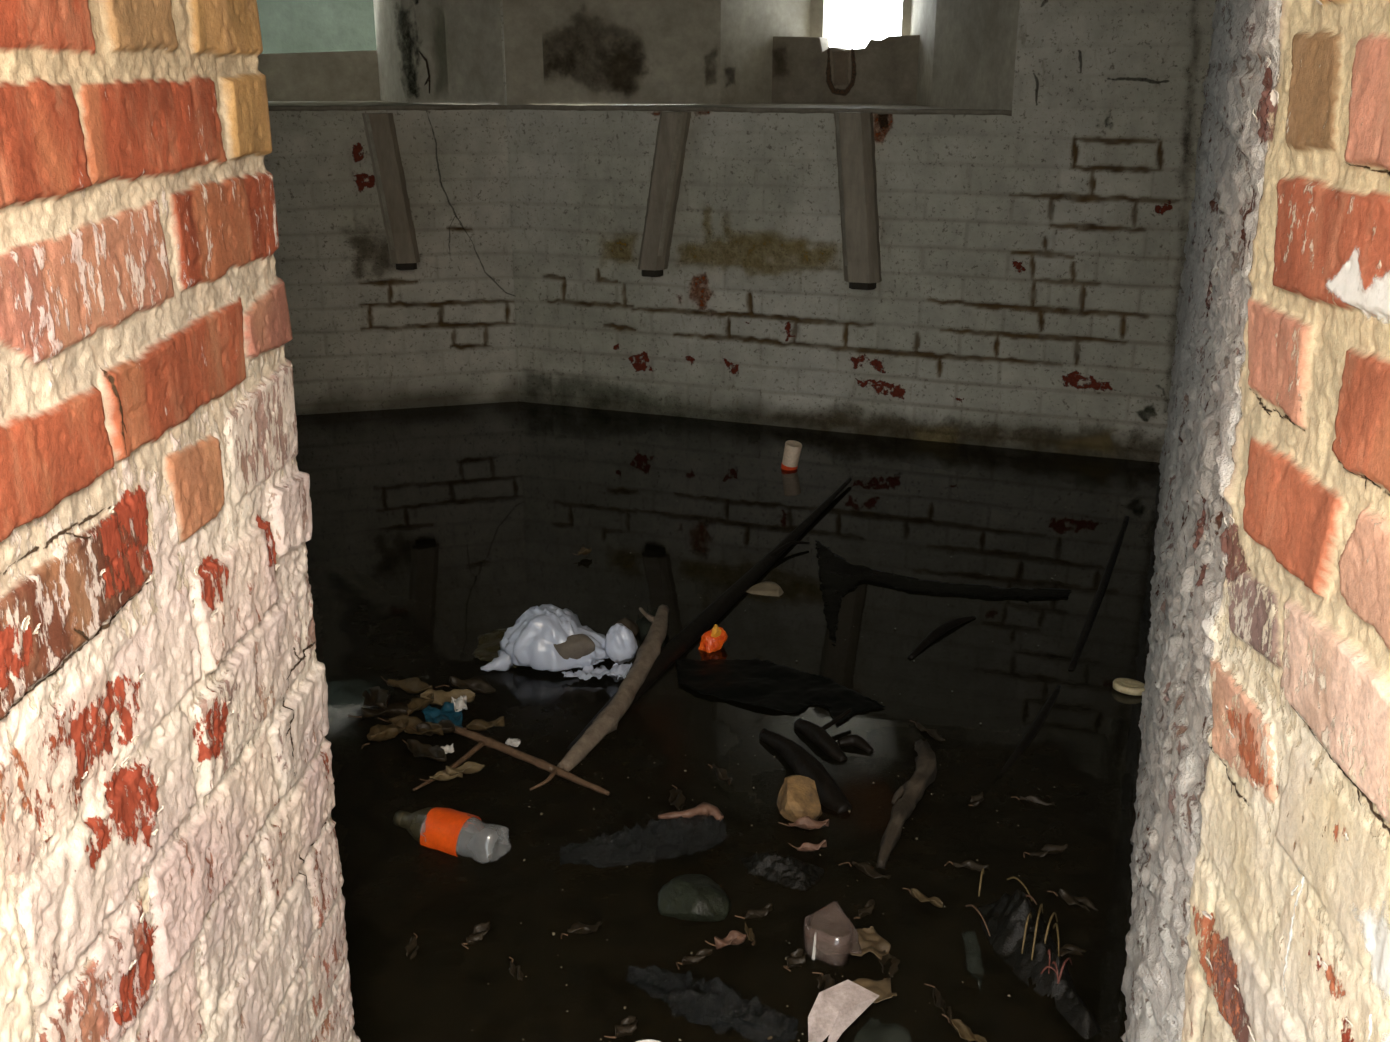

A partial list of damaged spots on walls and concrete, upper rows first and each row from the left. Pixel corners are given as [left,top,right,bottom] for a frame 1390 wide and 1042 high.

damp [543,17,643,92]
damp [682,210,834,274]
damp [777,411,1159,462]
crack [0,506,111,575]
peeling [90,484,154,599]
peeling [191,554,229,618]
peeling [0,615,41,692]
crack [0,582,148,720]
peeling [61,672,165,870]
peeling [192,686,234,772]
crack [1291,705,1390,835]
peeling [110,913,158,1026]